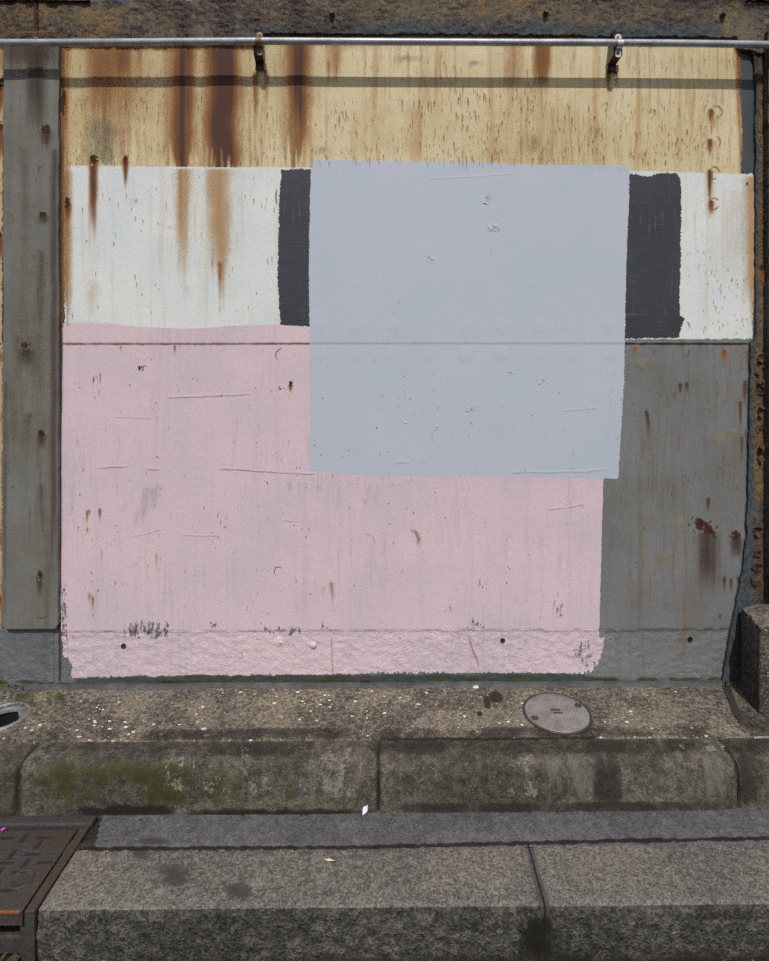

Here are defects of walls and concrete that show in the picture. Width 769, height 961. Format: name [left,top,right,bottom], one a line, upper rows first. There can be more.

rust [8,47,48,113]
rust [255,35,373,167]
rust [534,37,550,80]
rust [38,45,268,596]
rust [688,516,739,587]
rust [730,530,741,553]
rust [58,623,68,684]